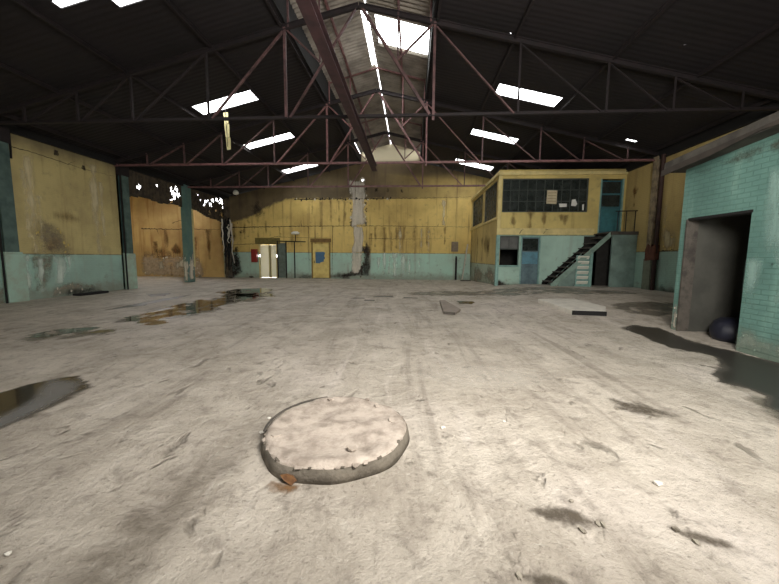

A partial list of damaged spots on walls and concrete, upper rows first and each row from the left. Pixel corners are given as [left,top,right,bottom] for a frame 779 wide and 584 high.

peeling [142,255,203,281]
peeling [349,177,369,277]